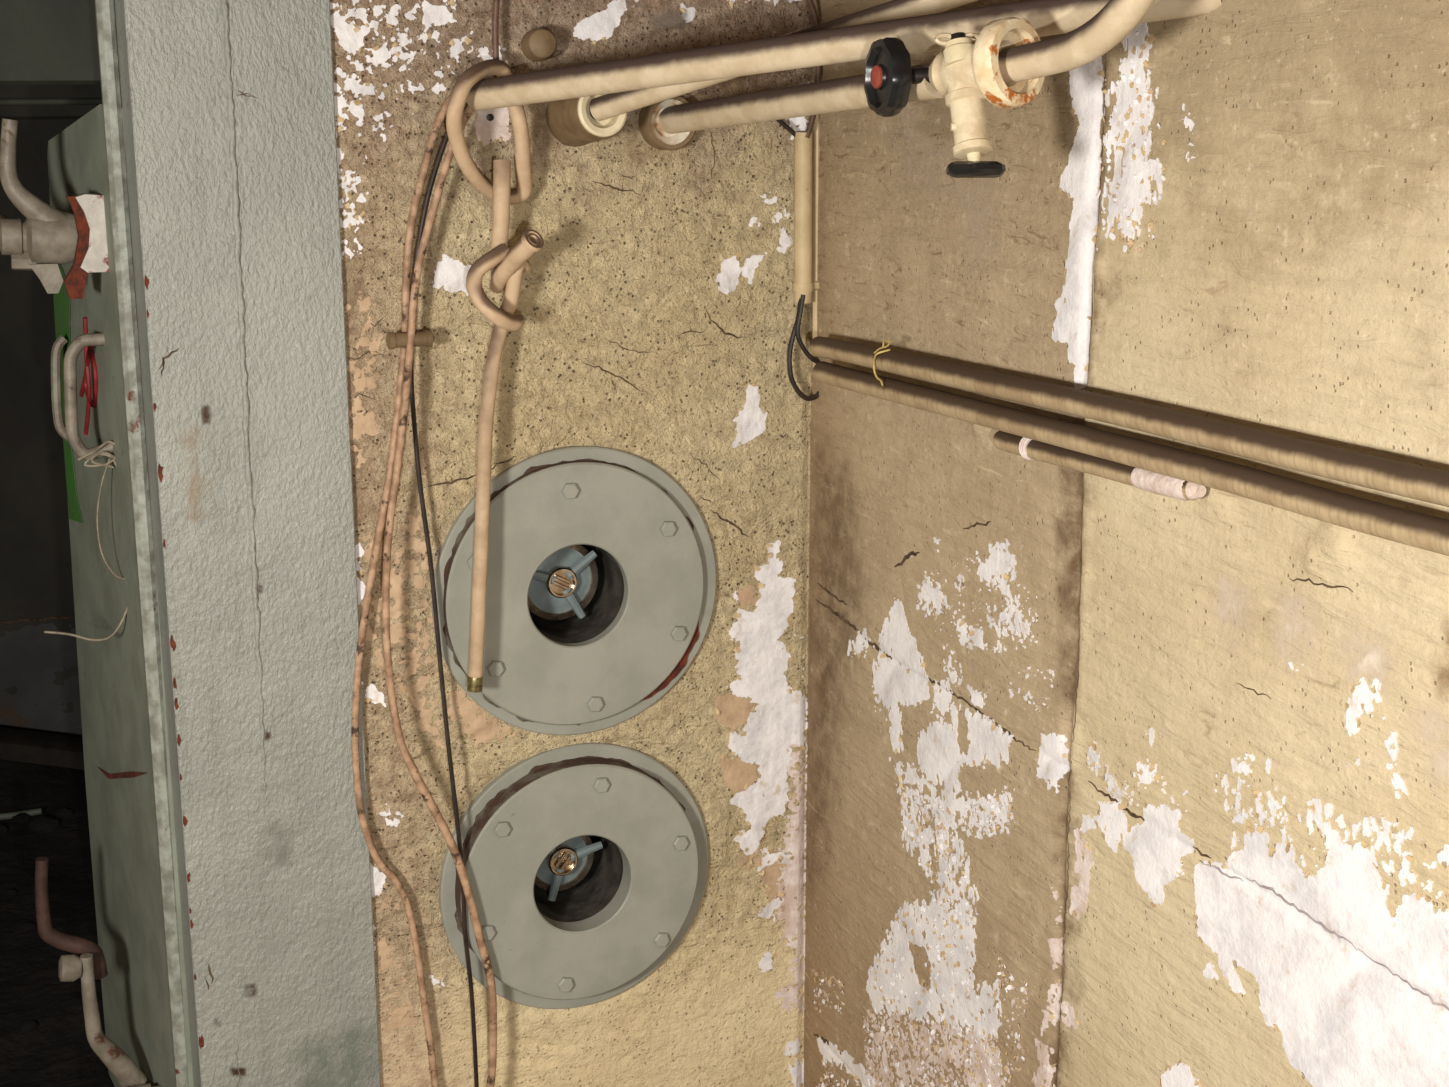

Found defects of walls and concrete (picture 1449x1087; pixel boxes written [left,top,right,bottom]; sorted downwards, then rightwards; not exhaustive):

peeling [330,0,511,259]
peeling [573,0,639,45]
peeling [679,3,696,23]
peeling [785,116,809,140]
peeling [1051,23,1166,390]
peeling [715,540,845,1016]
crack [816,583,1036,751]
crack [1072,490,1084,742]
crack [1056,781,1145,1084]
peeling [784,538,1449,1087]
crack [1289,578,1353,592]
crack [1193,847,1449,1011]